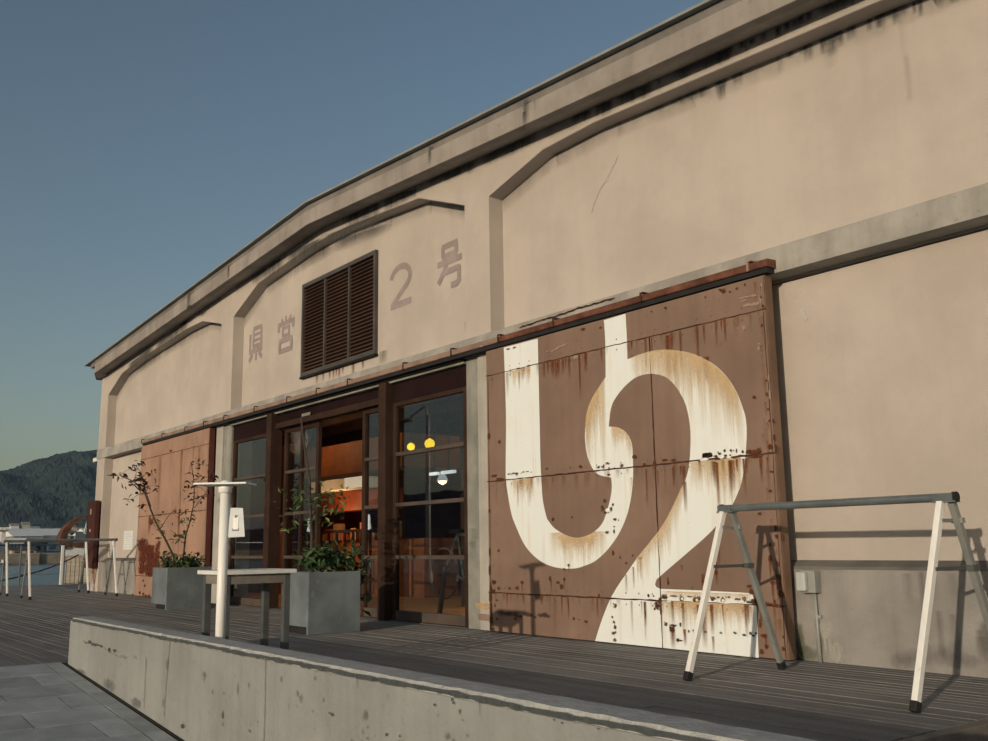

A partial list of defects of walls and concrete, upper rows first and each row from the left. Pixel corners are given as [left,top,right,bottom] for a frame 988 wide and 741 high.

water stain [678,33,764,74]
water stain [820,25,854,47]
water stain [868,0,921,23]
rust [638,317,736,398]
rust [586,380,604,429]
rust [491,475,533,491]
rust [612,380,777,577]
rust [554,531,598,545]
rust [132,537,170,598]
rust [478,549,524,631]
rust [631,525,784,654]